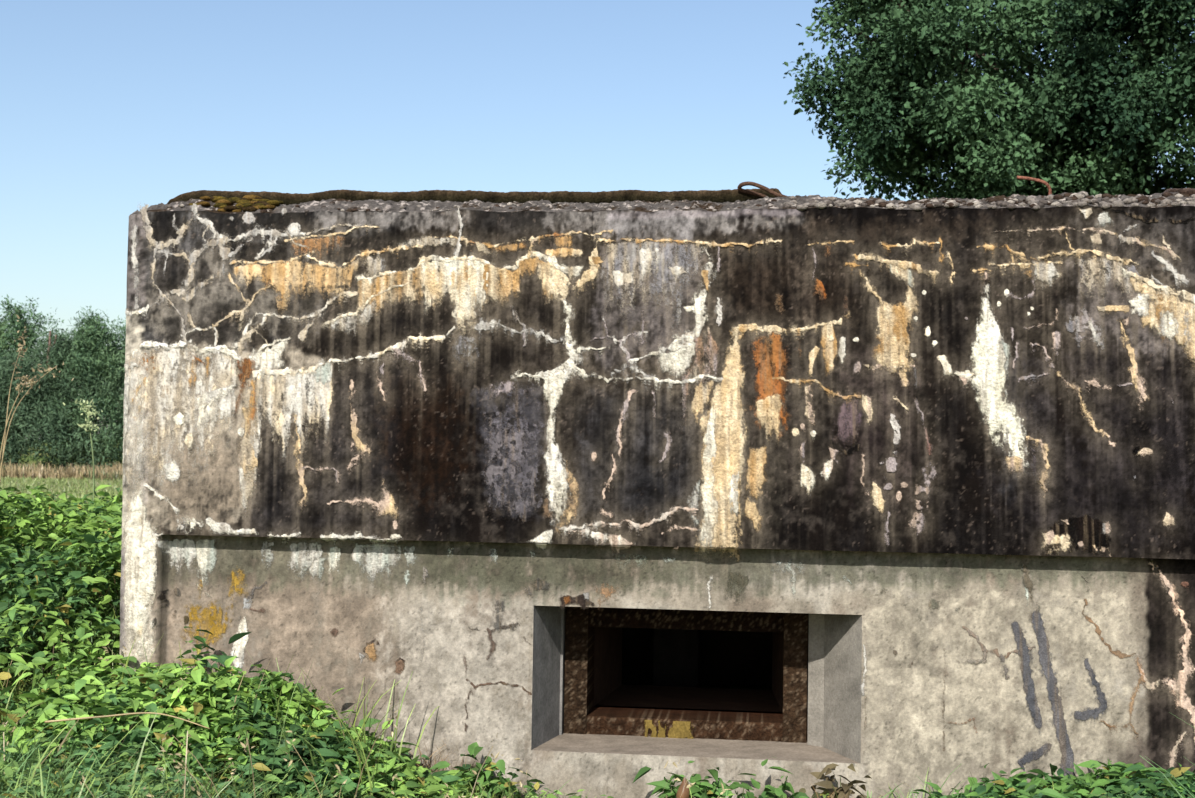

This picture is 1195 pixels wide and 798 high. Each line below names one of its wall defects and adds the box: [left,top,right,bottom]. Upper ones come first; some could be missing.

leakage [121,338,428,658]
crack [126,204,723,553]
leakage [322,239,767,602]
crack [598,238,955,283]
rust [730,297,850,439]
rust [812,252,826,298]
leakage [792,254,939,544]
leakage [937,272,1026,471]
crack [1008,281,1147,447]
crack [1003,202,1195,285]
leakage [1038,249,1195,359]
crack [1081,562,1195,768]